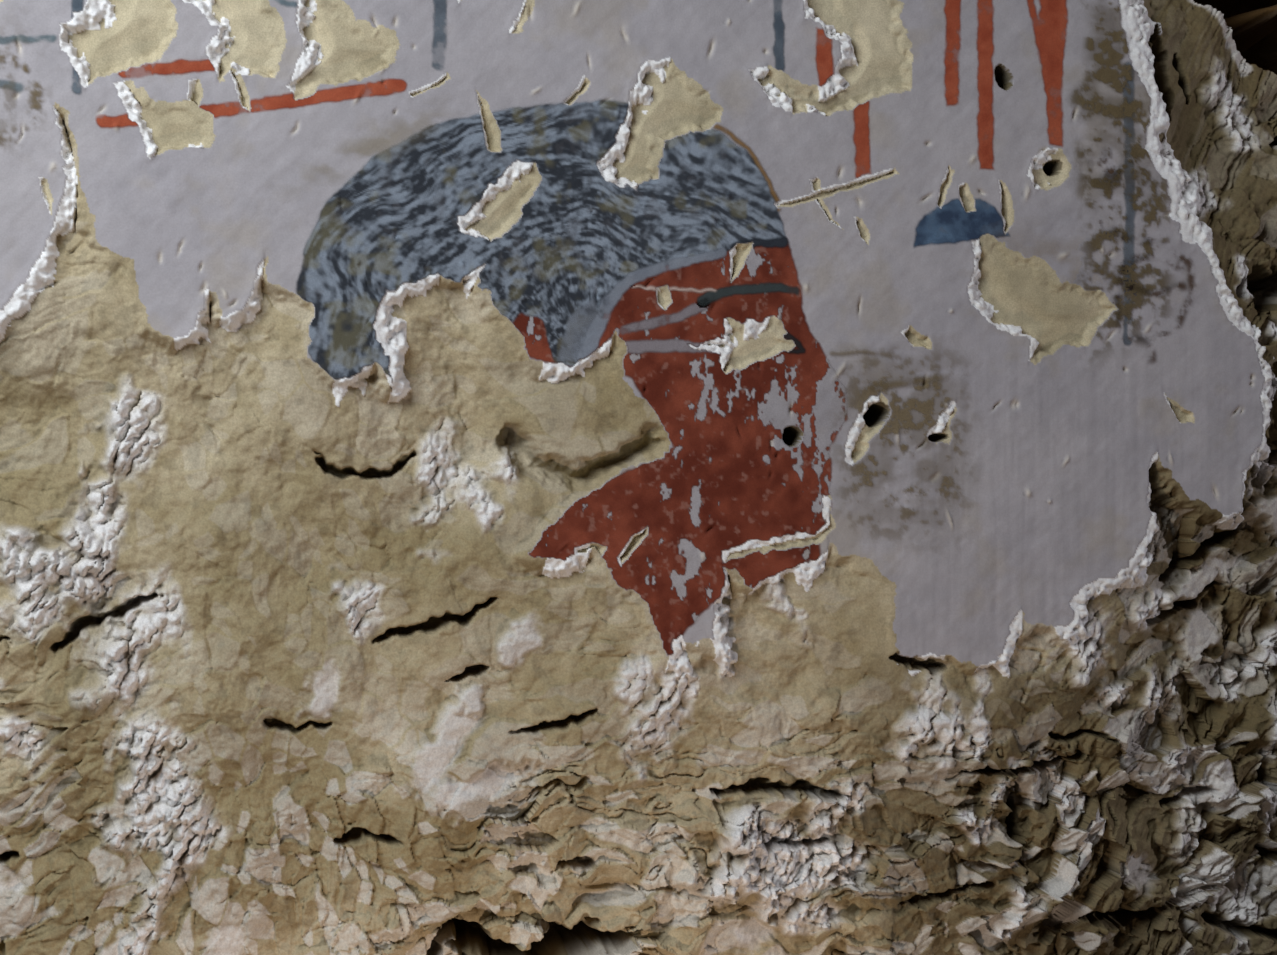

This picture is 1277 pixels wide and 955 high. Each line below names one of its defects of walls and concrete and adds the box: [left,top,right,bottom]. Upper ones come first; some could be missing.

spalling [60,0,401,159]
spalling [596,57,724,190]
spalling [749,0,914,117]
spalling [688,305,796,421]
spalling [1018,0,1277,743]
spalling [0,103,673,795]
crack [316,451,418,481]
peeling [722,358,847,563]
crack [0,636,11,644]
crack [50,593,165,654]
crack [372,597,498,644]
spalling [0,465,1277,955]